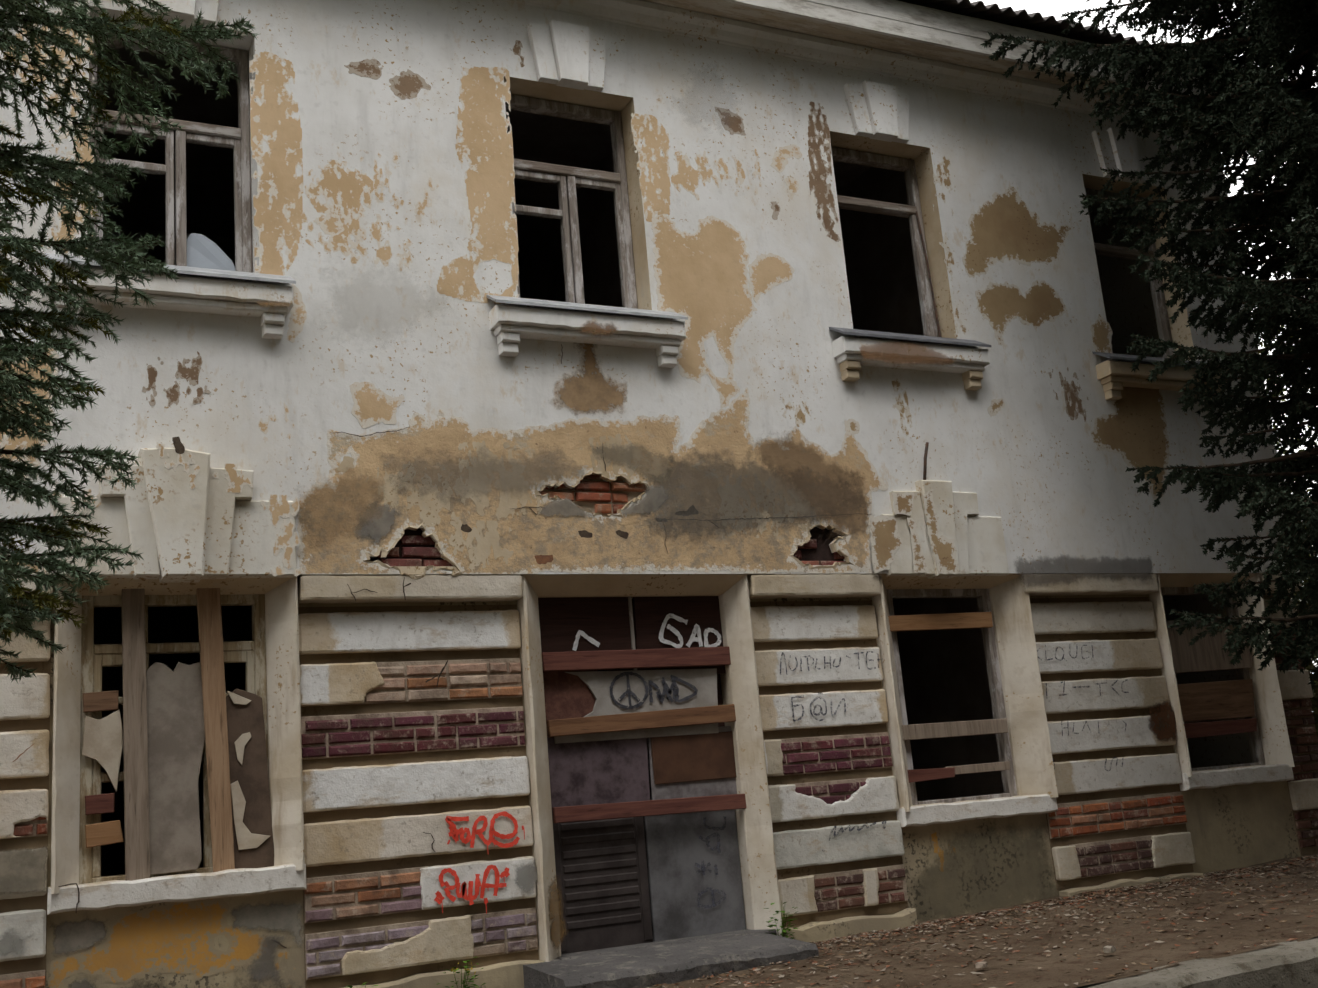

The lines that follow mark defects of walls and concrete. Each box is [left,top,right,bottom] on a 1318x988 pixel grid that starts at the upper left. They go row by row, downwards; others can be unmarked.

peeling [0,347,59,481]
peeling [249,51,439,343]
peeling [437,40,525,304]
peeling [156,101,957,579]
peeling [939,186,1071,346]
peeling [0,866,435,988]